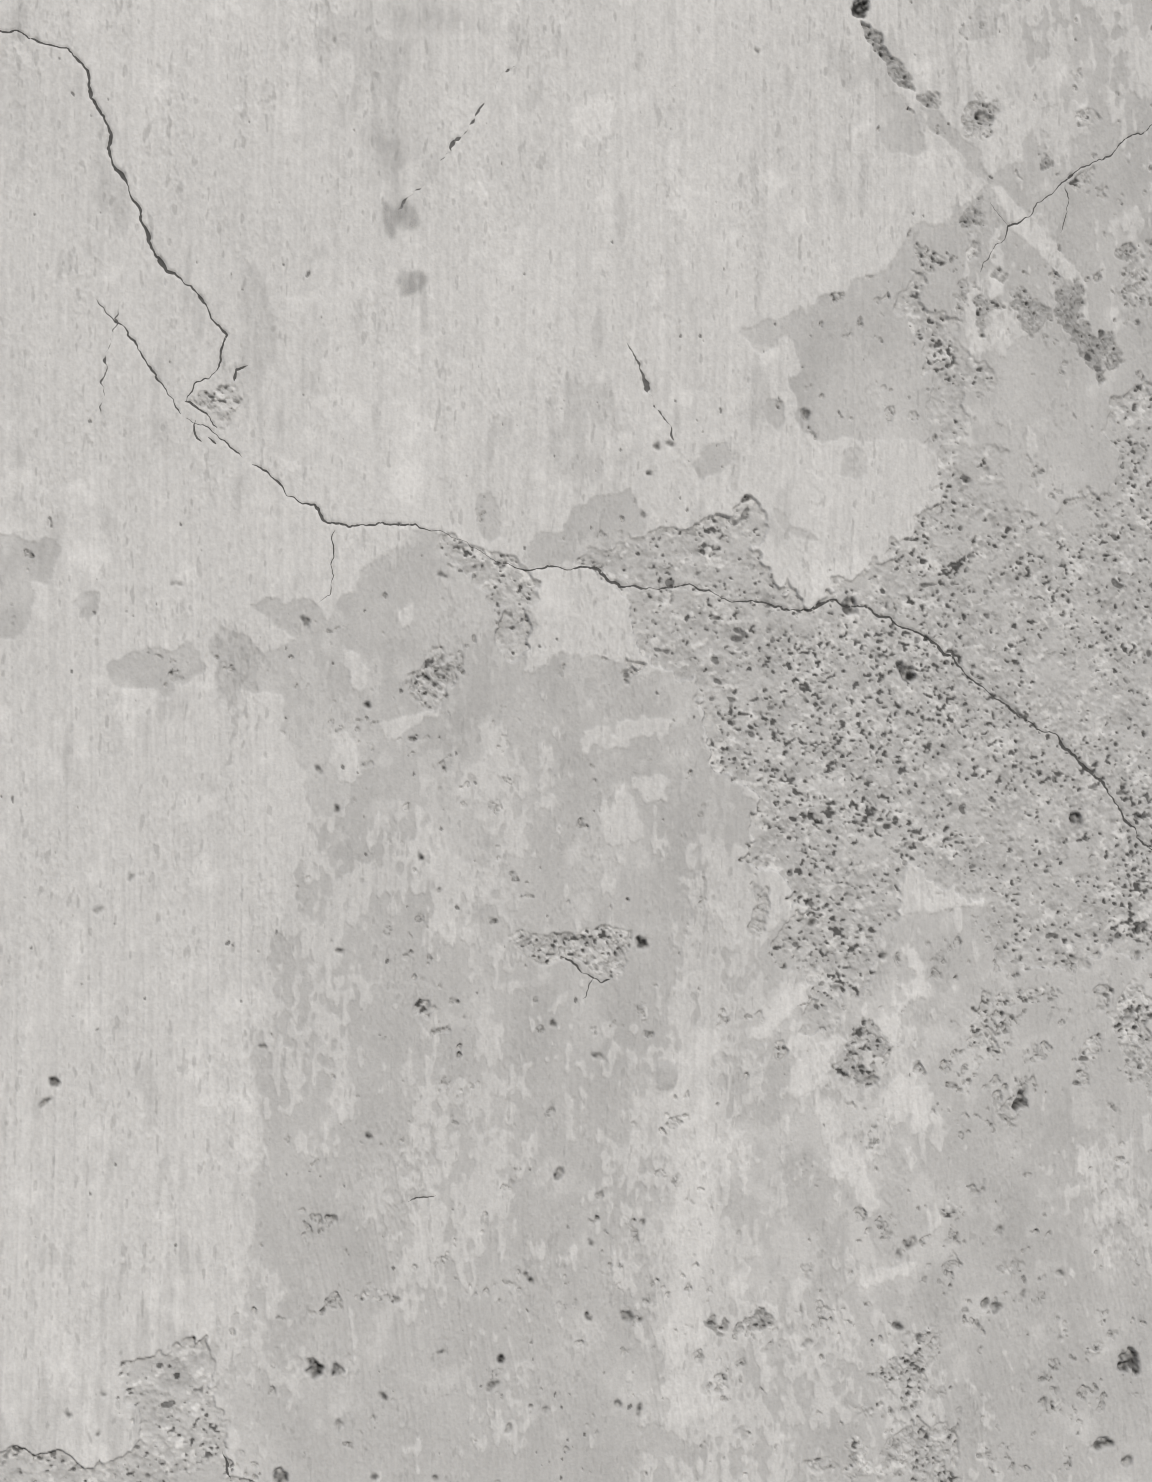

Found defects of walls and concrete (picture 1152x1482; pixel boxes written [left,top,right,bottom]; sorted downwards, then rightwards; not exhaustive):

crack [0,30,1152,850]
peeling [476,493,502,544]
spalling [526,0,1152,1037]
peeling [0,534,63,640]
peeling [73,591,99,624]
peeling [107,641,207,700]
peeling [209,529,542,819]
spalling [40,1078,60,1109]
peeling [206,652,1152,1482]